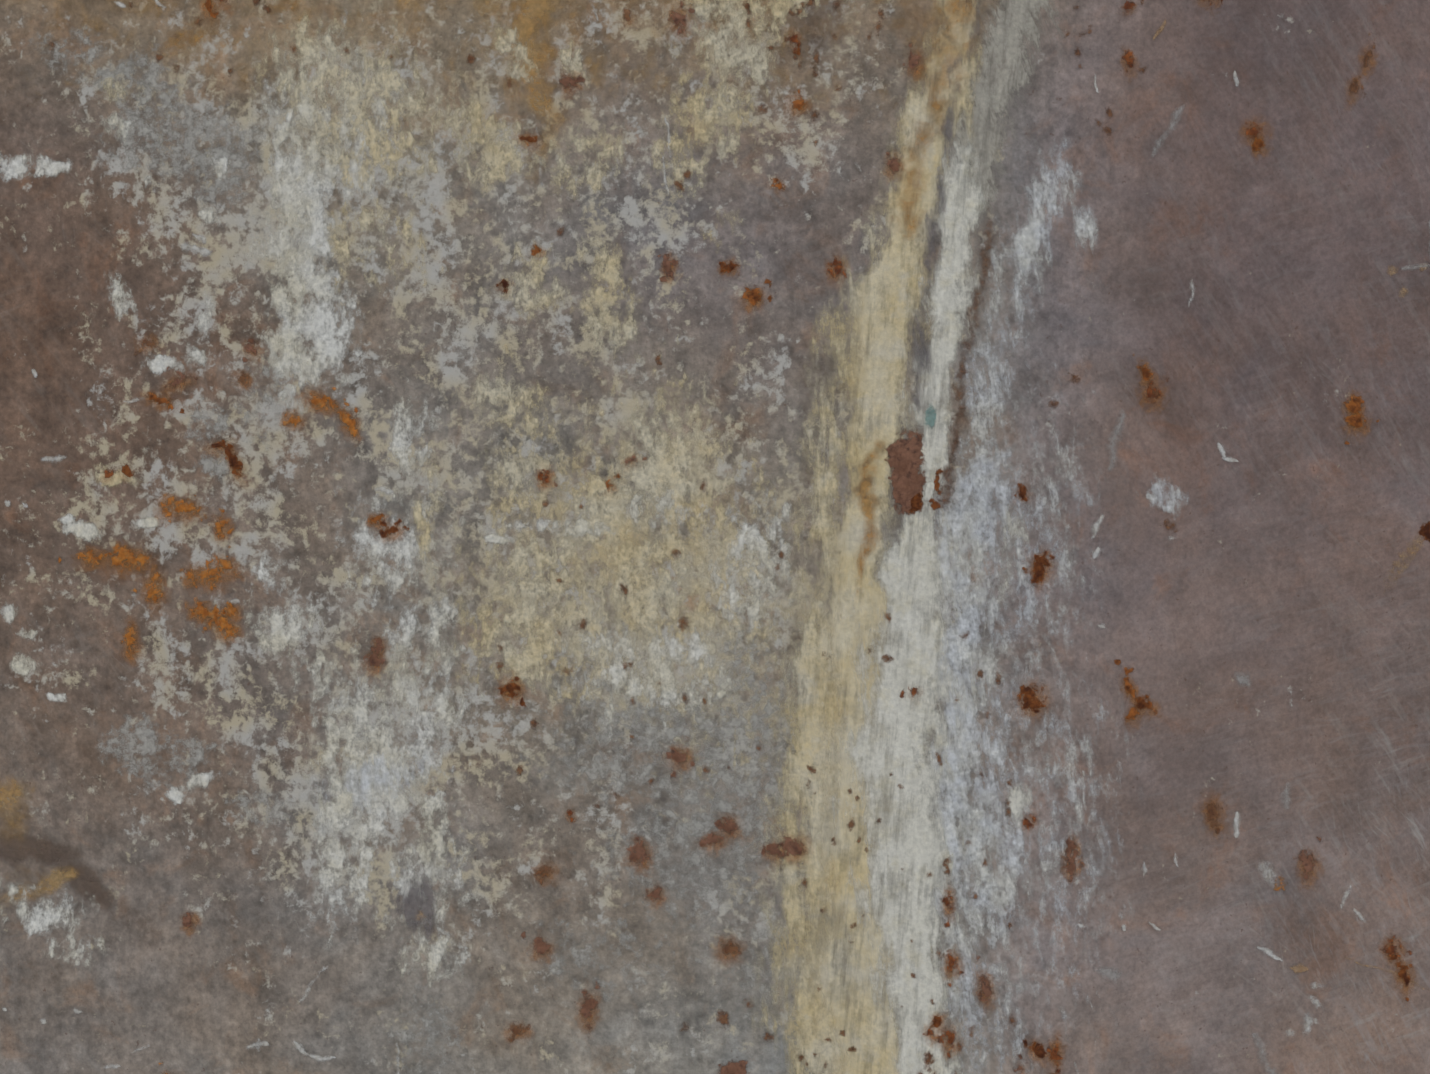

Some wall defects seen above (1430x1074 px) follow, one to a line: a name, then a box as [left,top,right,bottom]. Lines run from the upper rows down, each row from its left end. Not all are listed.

rust [668,1,695,34]
peeling [652,0,819,197]
peeling [187,16,637,477]
peeling [147,348,205,374]
rust [283,387,359,437]
peeling [60,514,100,541]
rust [58,543,165,607]
rust [160,494,240,641]
peeling [245,272,864,1074]
peeling [98,713,216,805]
rust [718,1060,748,1074]
rust [1014,1038,1063,1073]